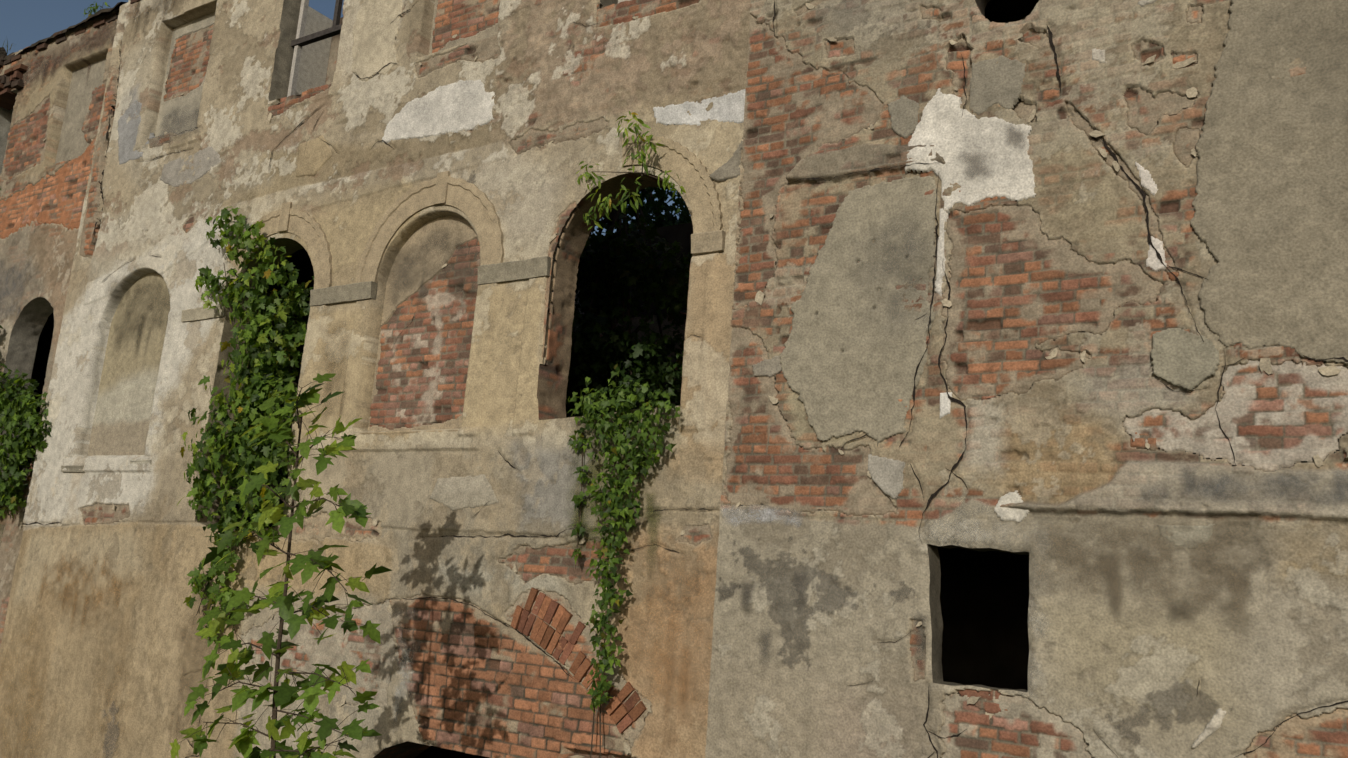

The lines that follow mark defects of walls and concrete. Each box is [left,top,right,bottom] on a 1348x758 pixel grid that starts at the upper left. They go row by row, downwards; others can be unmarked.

flaking render [0,75,118,259]
flaking render [370,238,480,430]
flaking render [415,0,500,78]
flaking render [733,15,883,310]
flaking render [724,327,897,519]
crack [785,162,968,543]
crack [960,54,968,116]
flaking render [941,205,1164,401]
crack [1047,25,1246,465]
flaking render [1123,0,1348,472]
flaking render [240,537,652,758]
crack [923,687,965,758]